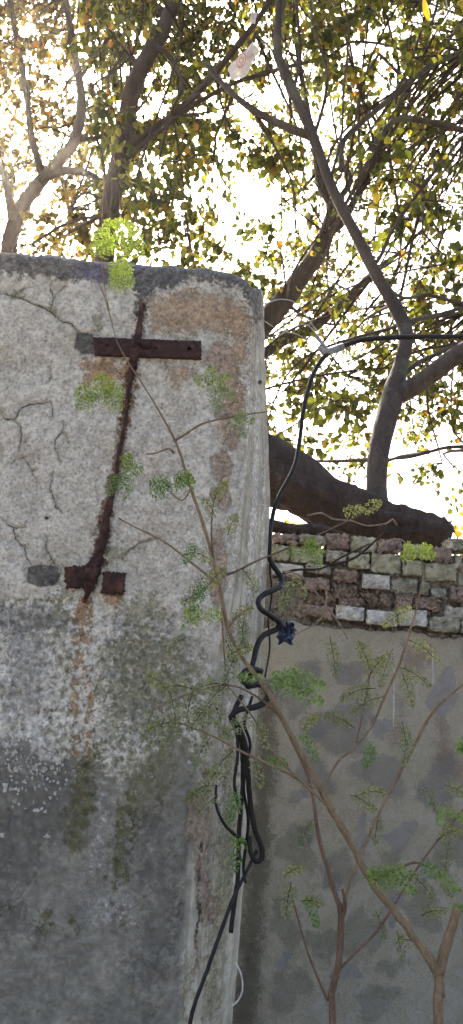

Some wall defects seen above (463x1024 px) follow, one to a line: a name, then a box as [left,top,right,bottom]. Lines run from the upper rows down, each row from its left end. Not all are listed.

crack [0,285,93,349]
crack [0,376,68,512]
rust [79,356,139,567]
crack [3,520,56,565]